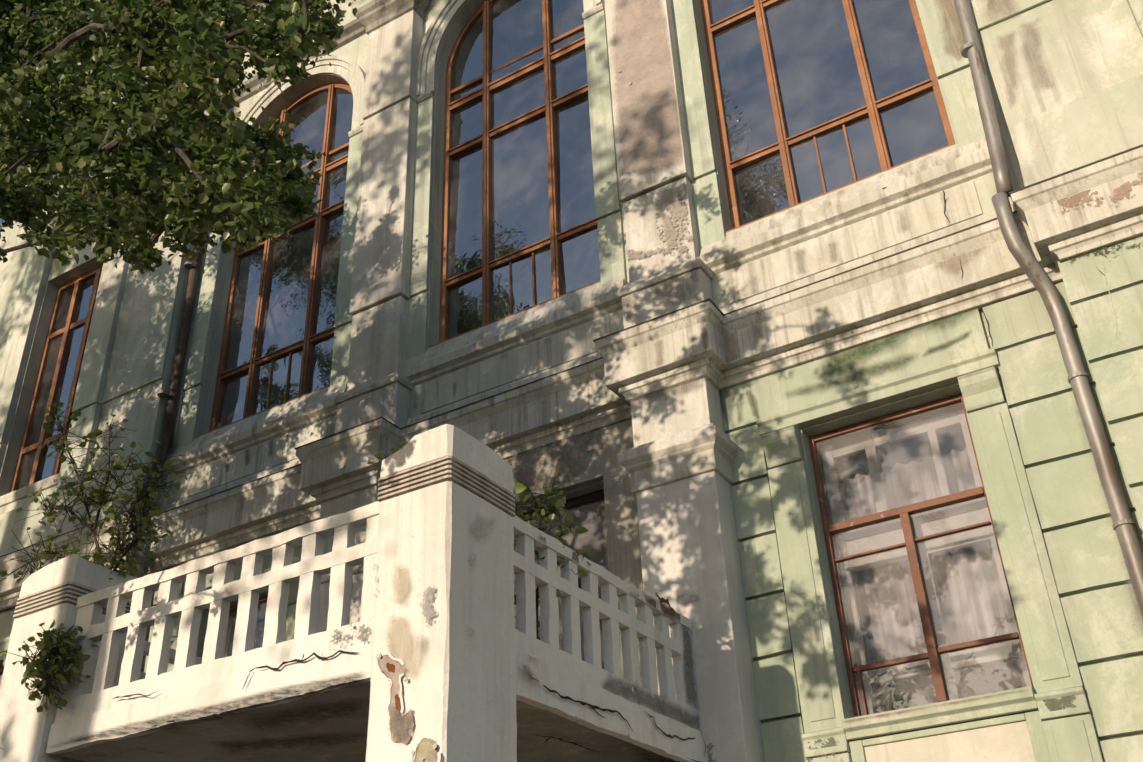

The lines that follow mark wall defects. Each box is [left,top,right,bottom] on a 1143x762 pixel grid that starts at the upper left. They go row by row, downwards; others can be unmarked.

mould [801,311,967,392]
crack [242,650,359,690]
spalling [321,619,372,655]
spalling [64,674,363,744]
spalling [376,652,441,762]
crack [537,685,706,756]